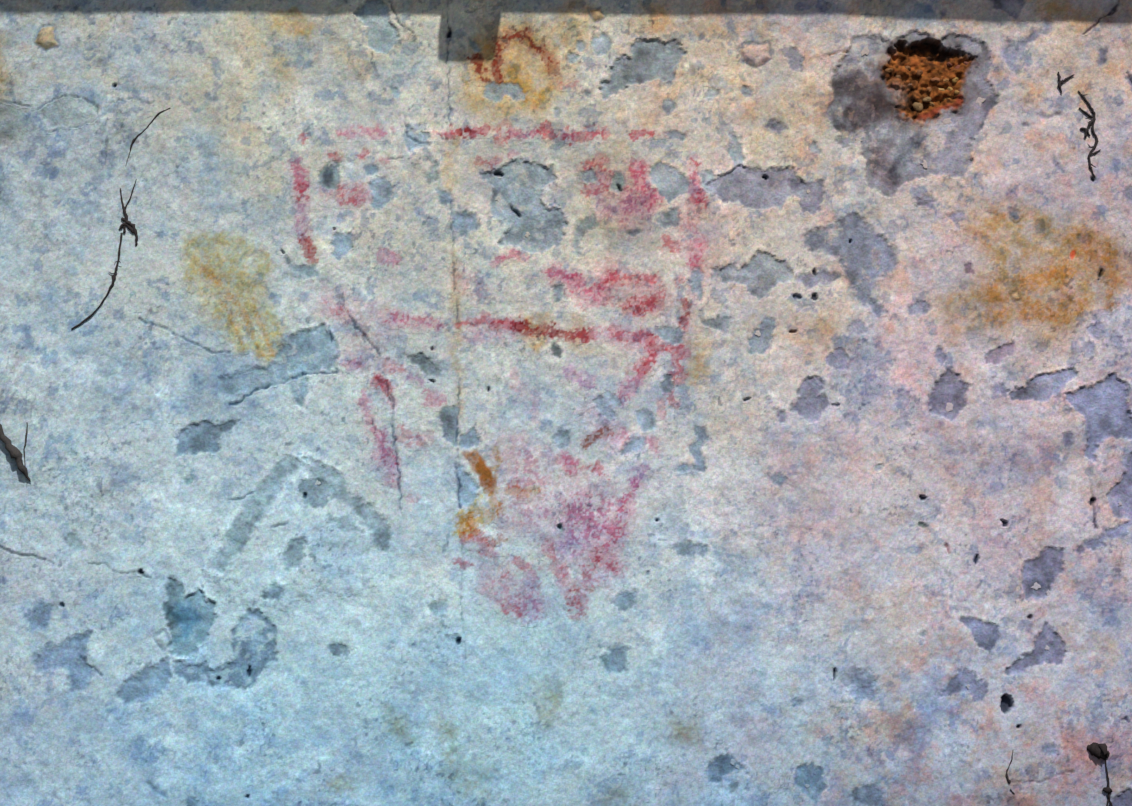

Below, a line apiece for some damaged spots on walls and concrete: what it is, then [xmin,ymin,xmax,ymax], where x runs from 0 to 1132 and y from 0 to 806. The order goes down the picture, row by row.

rust [862,30,1002,144]
peeling [809,0,1055,225]
rust [917,187,1132,354]